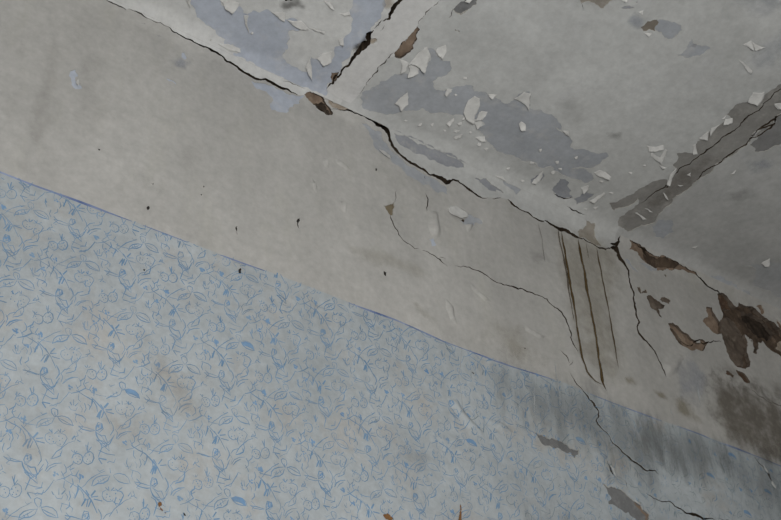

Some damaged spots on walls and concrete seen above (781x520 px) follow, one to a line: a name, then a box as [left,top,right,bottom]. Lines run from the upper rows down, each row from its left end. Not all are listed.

crack [107,0,298,95]
crack [327,0,402,88]
peeling [186,0,781,383]
crack [331,109,666,376]
crack [645,89,781,201]
crack [390,192,657,472]
damp [719,388,781,458]
crack [649,495,723,520]